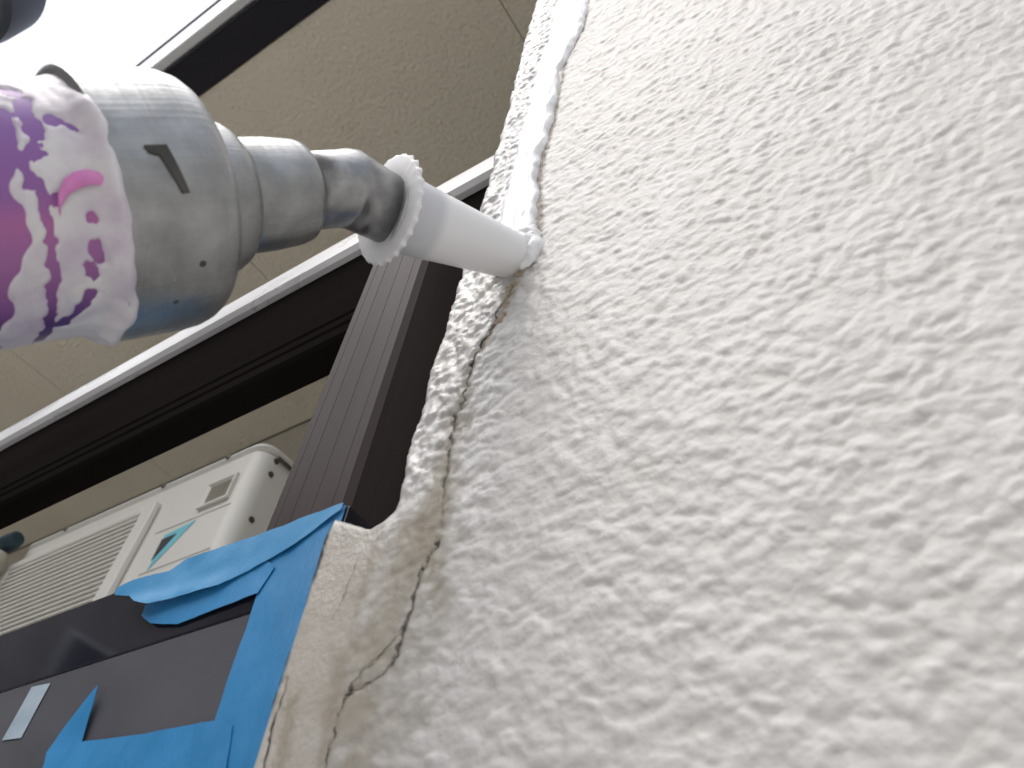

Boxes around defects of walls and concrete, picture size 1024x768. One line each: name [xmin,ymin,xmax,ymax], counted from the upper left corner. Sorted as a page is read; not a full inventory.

crack [325,280,513,768]